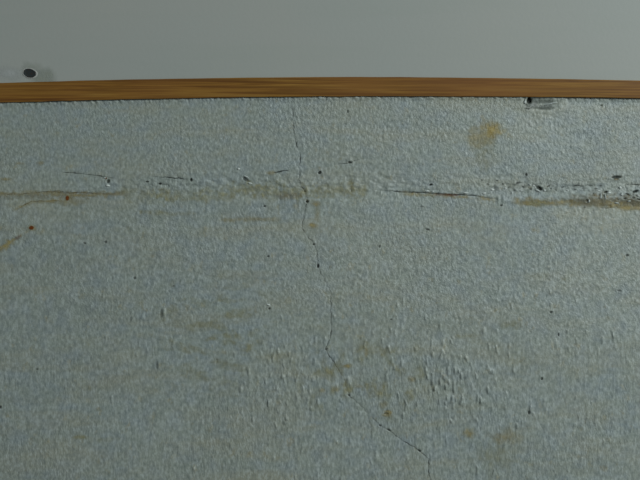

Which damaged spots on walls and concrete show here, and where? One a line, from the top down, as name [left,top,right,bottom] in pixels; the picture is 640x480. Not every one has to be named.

crack [395,188,494,200]